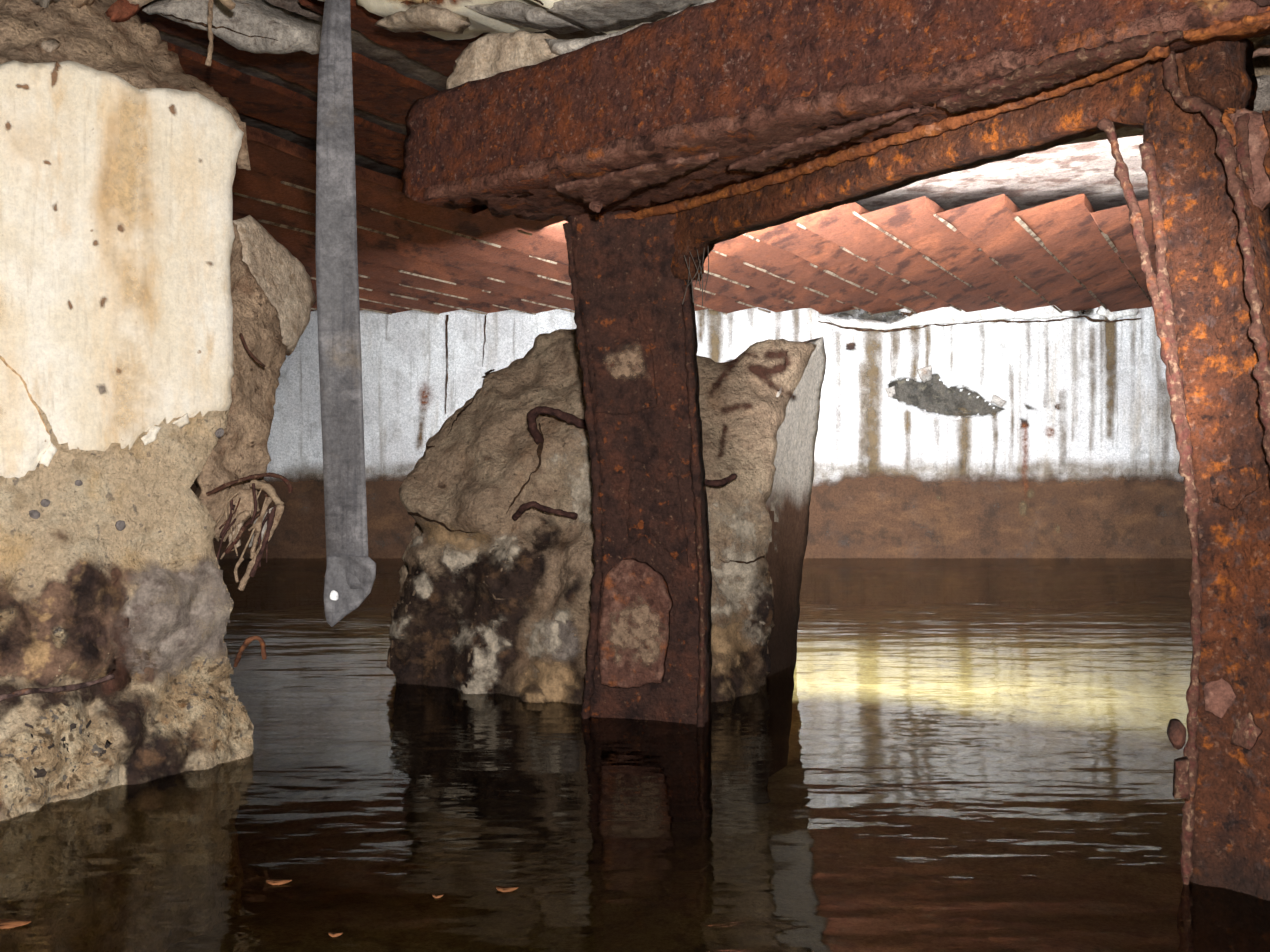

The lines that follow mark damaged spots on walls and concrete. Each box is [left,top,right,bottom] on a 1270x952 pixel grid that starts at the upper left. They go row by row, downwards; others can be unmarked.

spalling [0,410,273,615]
damp [0,470,327,799]
damp [366,469,585,719]
spalling [885,365,1006,417]
damp [804,317,1192,572]
spalling [0,660,253,952]